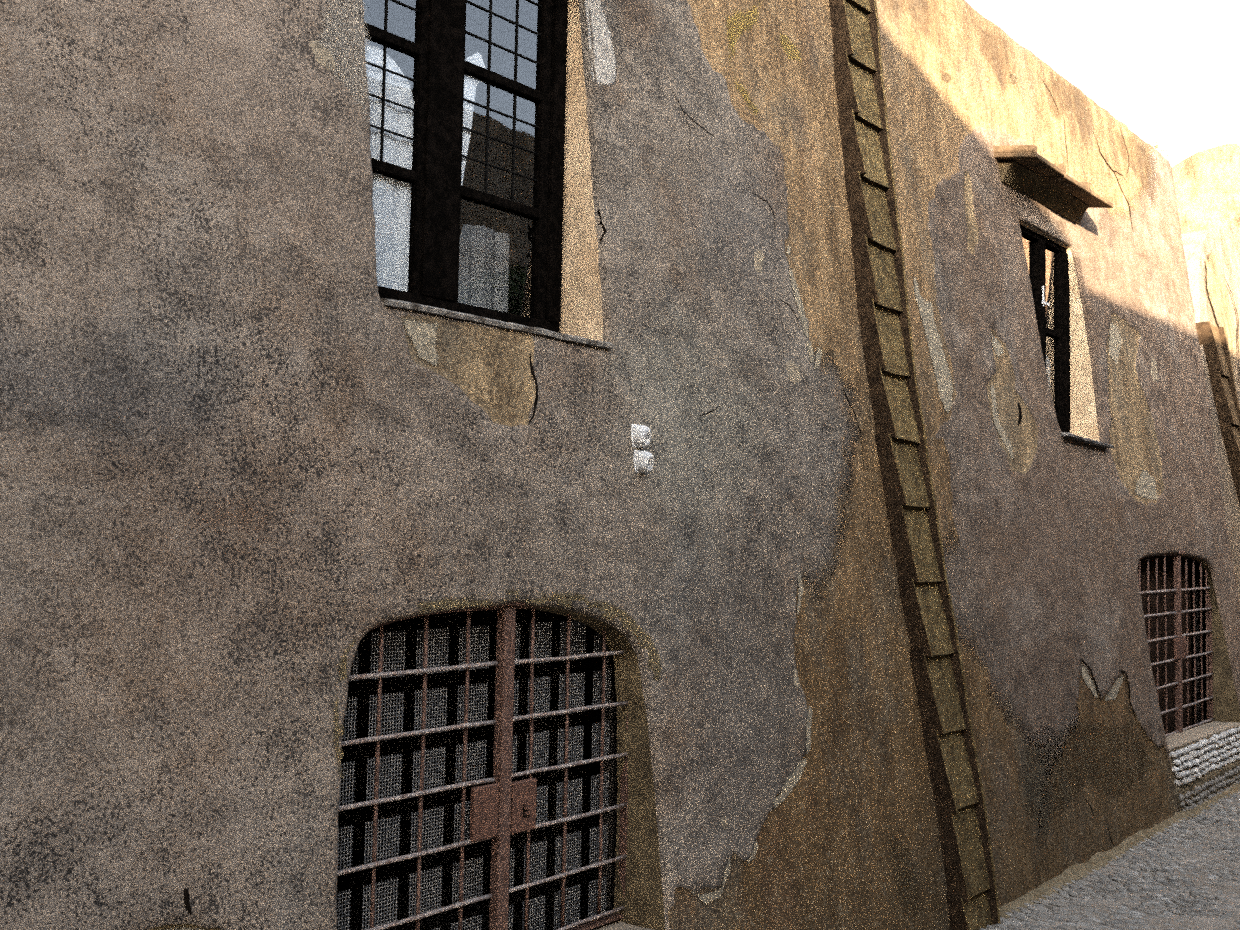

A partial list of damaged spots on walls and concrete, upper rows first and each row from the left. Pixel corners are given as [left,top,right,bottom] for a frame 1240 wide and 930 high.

peeling [585,0,616,84]
crack [1041,78,1134,233]
spalling [401,315,536,427]
peeling [668,0,951,930]
peeling [876,0,1154,554]
spalling [1106,313,1164,506]
spalling [955,617,1177,907]